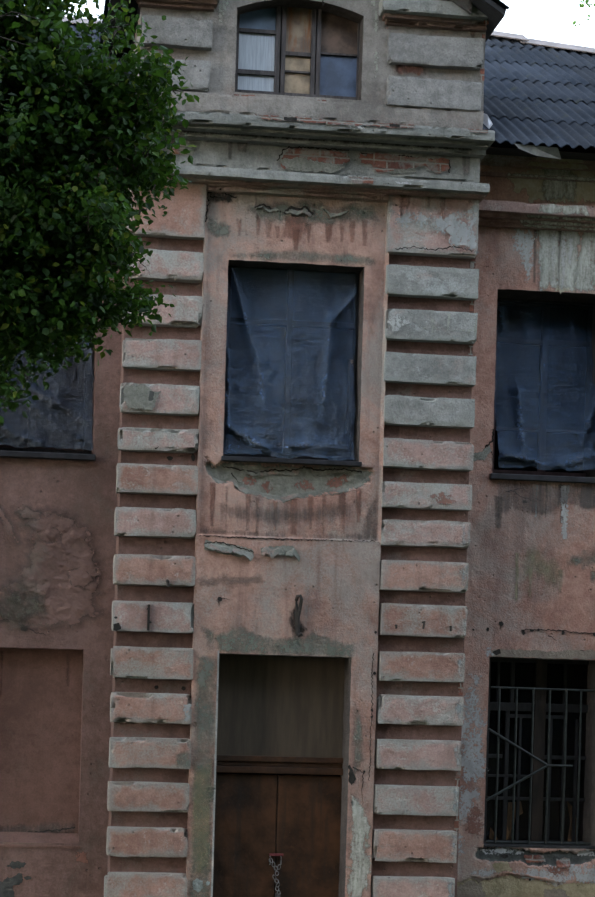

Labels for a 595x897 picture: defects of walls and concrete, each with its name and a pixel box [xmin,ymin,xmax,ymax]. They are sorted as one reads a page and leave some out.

flaking render [277,146,451,185]
peeling [389,205,478,268]
damp [507,151,595,294]
flaking render [205,462,373,503]
peeling [454,672,489,856]
flaking render [457,847,595,897]